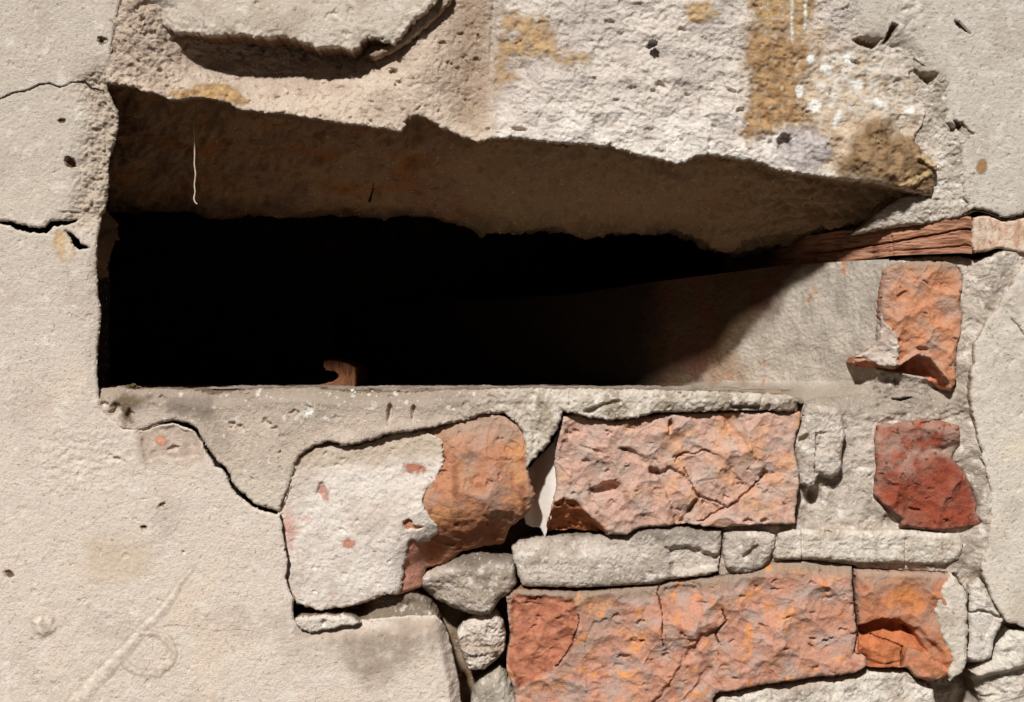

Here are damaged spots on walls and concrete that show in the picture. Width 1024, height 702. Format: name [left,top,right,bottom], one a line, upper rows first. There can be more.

crack [0,81,103,99]
peeling [898,154,937,189]
crack [5,220,88,285]
peeling [299,403,314,419]
crack [162,420,389,597]
spalling [507,594,578,686]